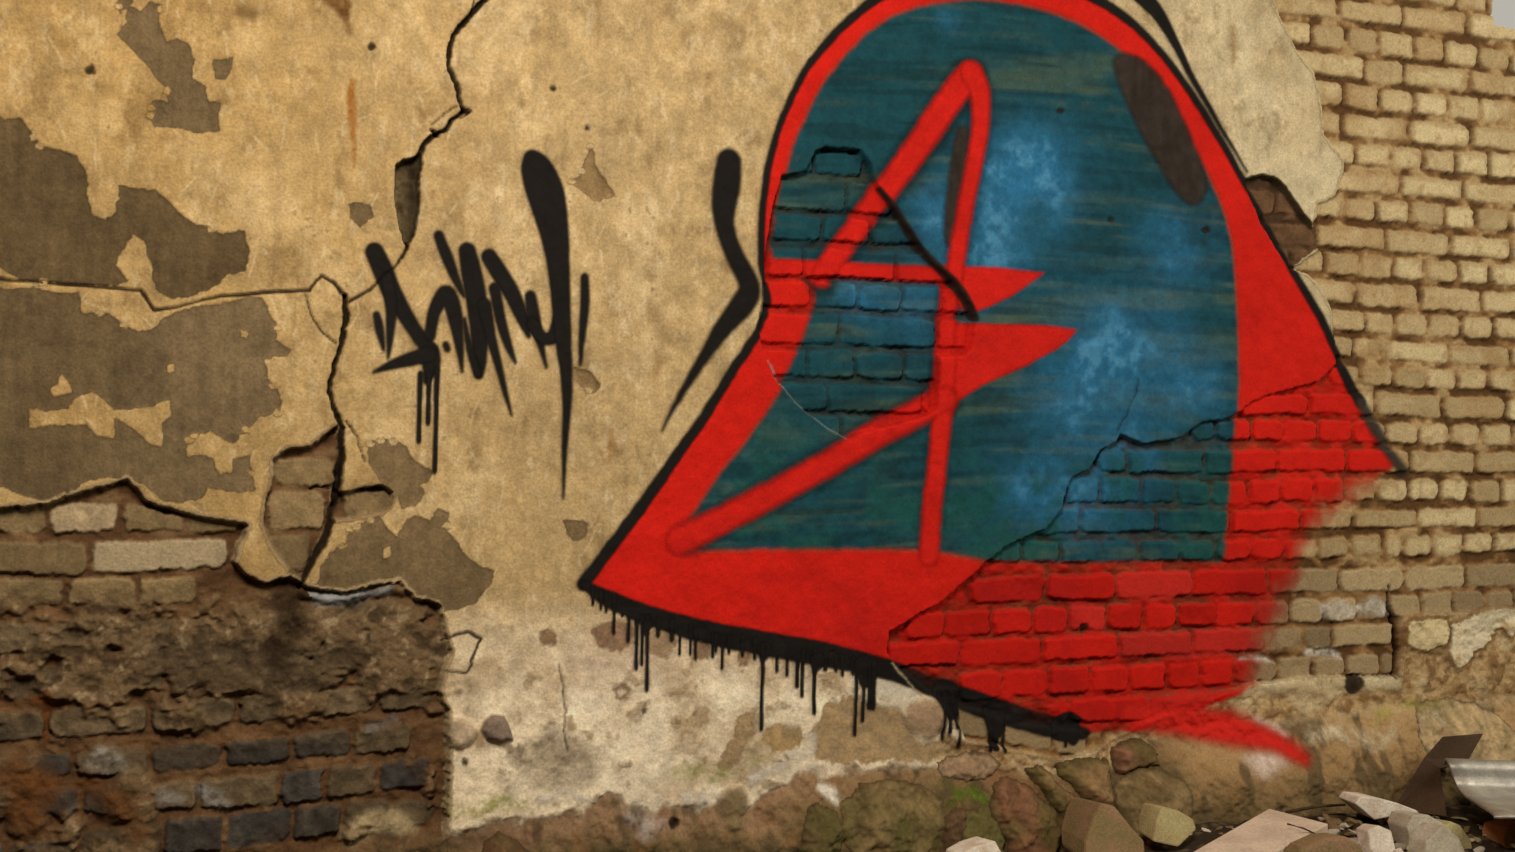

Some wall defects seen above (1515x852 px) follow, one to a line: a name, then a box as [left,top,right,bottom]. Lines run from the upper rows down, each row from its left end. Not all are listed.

peeling [114,0,233,133]
crack [419,0,488,153]
crack [0,244,409,588]
flaking render [0,117,494,852]
flaking render [794,276,902,316]
flaking render [979,414,1286,649]
flaking render [1213,0,1515,694]
flaking render [1048,658,1100,672]
flaking render [1129,654,1161,666]